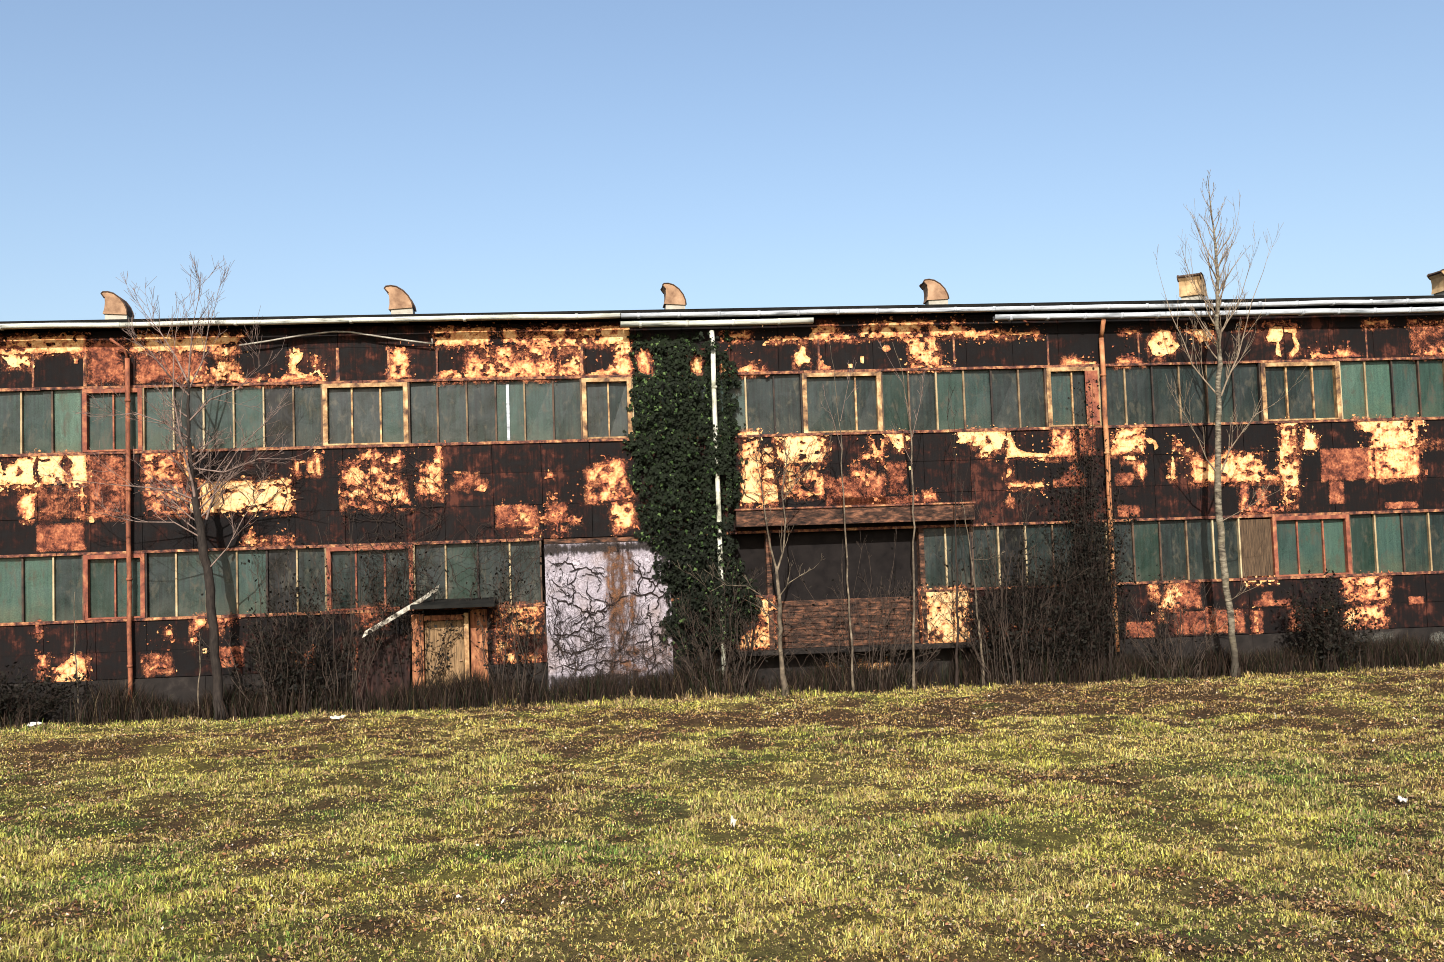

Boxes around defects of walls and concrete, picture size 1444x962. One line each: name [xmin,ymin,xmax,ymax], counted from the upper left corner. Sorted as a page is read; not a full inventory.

rust [87,338,209,386]
peeling [384,322,654,384]
peeling [689,314,1046,377]
rust [36,455,126,552]
peeling [138,440,461,547]
rust [825,462,938,506]
peeling [955,421,1079,508]
peeling [1110,416,1322,515]
rust [1320,447,1371,504]
peeling [1352,412,1430,484]
crack [547,553,669,675]
rust [1173,583,1333,635]